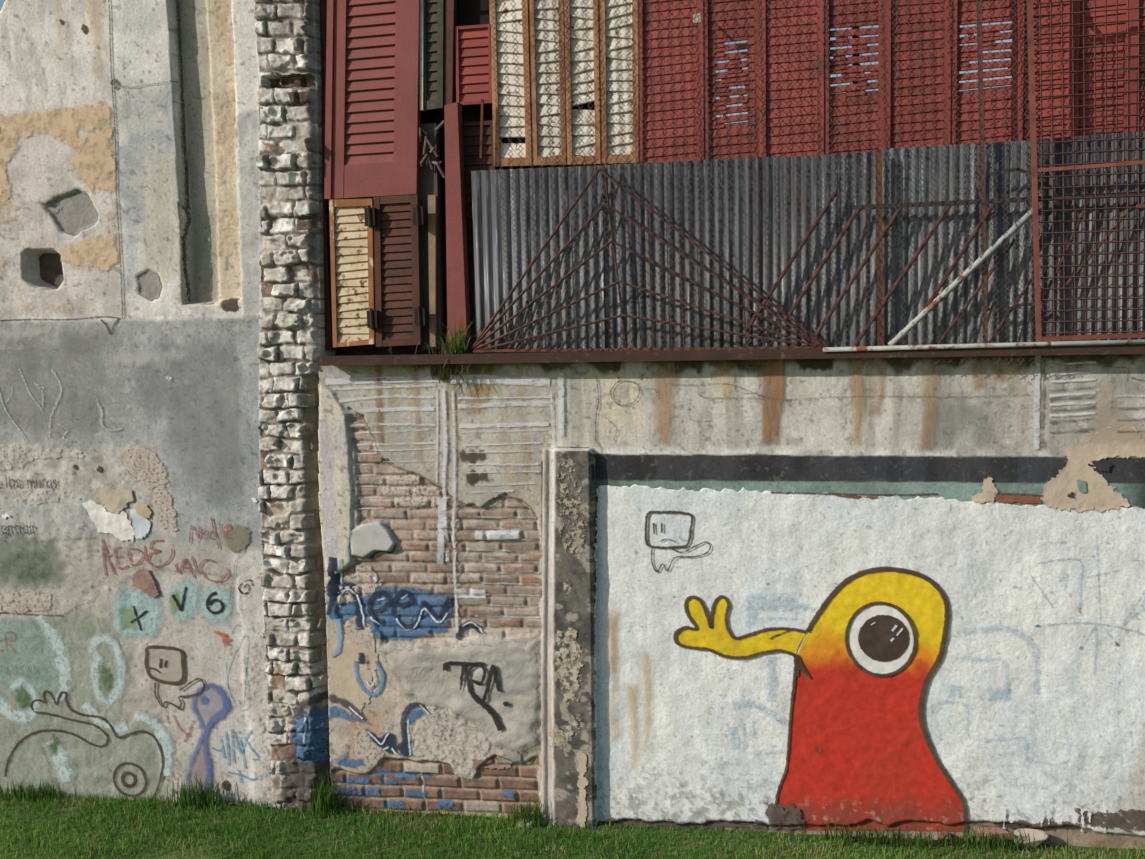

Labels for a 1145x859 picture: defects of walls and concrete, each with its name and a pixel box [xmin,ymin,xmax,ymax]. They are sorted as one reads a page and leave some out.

peeling [0,102,118,271]
crack [0,0,191,334]
rust [656,363,674,442]
rust [760,359,785,443]
rust [850,359,882,438]
rust [921,363,936,449]
peeling [0,444,84,474]
peeling [14,446,178,541]
flaking render [349,408,535,517]
flaking render [972,425,1145,513]
spalling [297,372,397,716]
peeling [351,706,537,781]